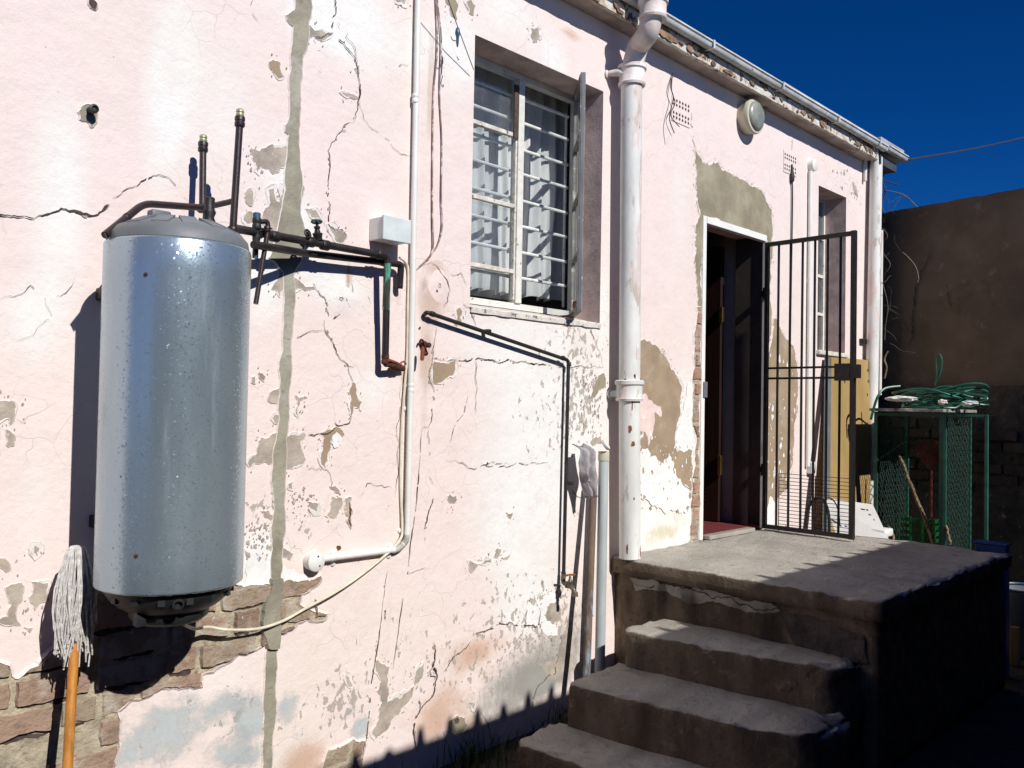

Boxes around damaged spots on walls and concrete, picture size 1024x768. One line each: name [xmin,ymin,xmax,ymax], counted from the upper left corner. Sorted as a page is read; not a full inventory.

crack [317,0,411,233]
peeling [659,24,784,102]
crack [0,174,185,219]
peeling [241,138,288,244]
peeling [0,390,26,448]
peeling [246,367,353,529]
peeling [430,357,461,390]
peeling [640,145,774,542]
crack [362,312,602,760]
flaking render [0,506,328,768]
peeling [629,577,868,664]
peeling [319,658,429,768]